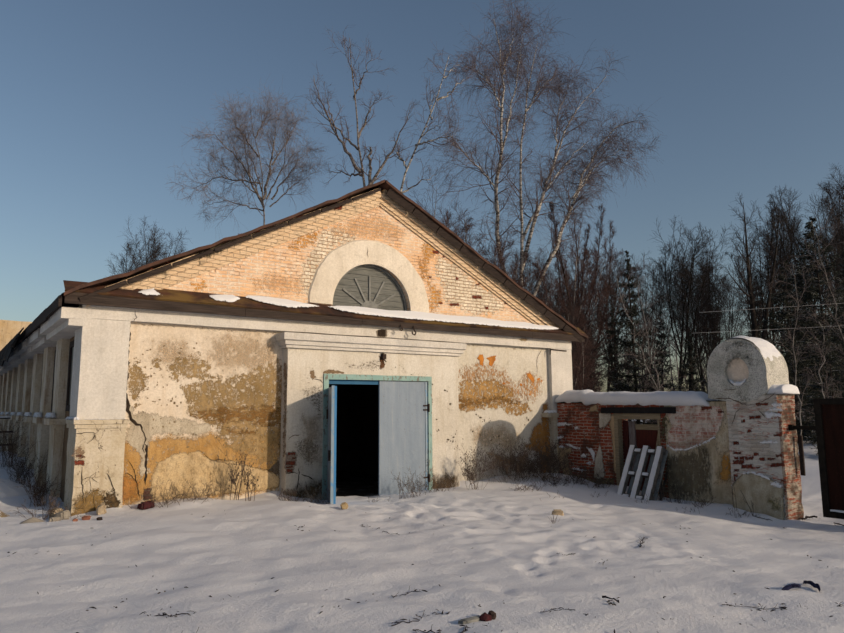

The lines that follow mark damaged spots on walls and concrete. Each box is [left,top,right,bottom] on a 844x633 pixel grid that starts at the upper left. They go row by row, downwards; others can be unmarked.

peeling [429,250,507,316]
crack [77,314,148,509]
peeling [127,342,318,475]
peeling [449,354,543,425]
flaking render [658,405,724,449]
flaking render [733,441,784,481]